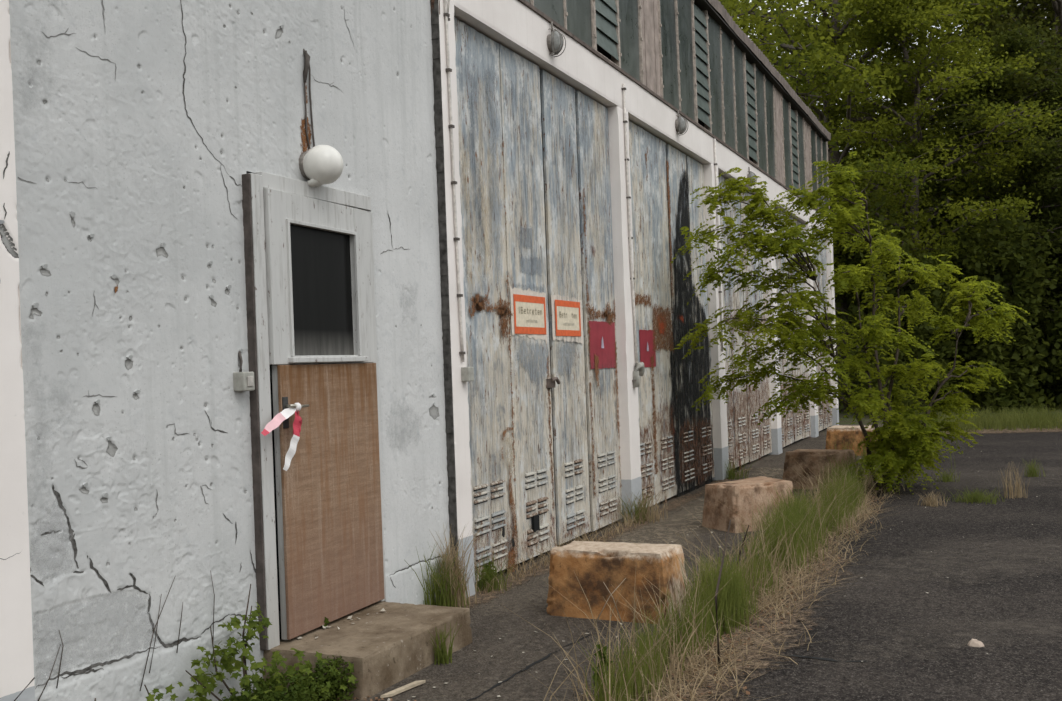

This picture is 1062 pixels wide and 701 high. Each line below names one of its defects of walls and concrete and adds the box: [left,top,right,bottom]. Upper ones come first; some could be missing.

crack [41,29,116,81]
crack [180,0,241,218]
rust [300,117,312,152]
spalling [0,220,19,258]
crack [167,411,227,436]
rust [469,186,622,573]
rust [635,161,714,502]
rust [723,290,832,469]
crack [0,553,44,586]
crack [35,485,256,689]